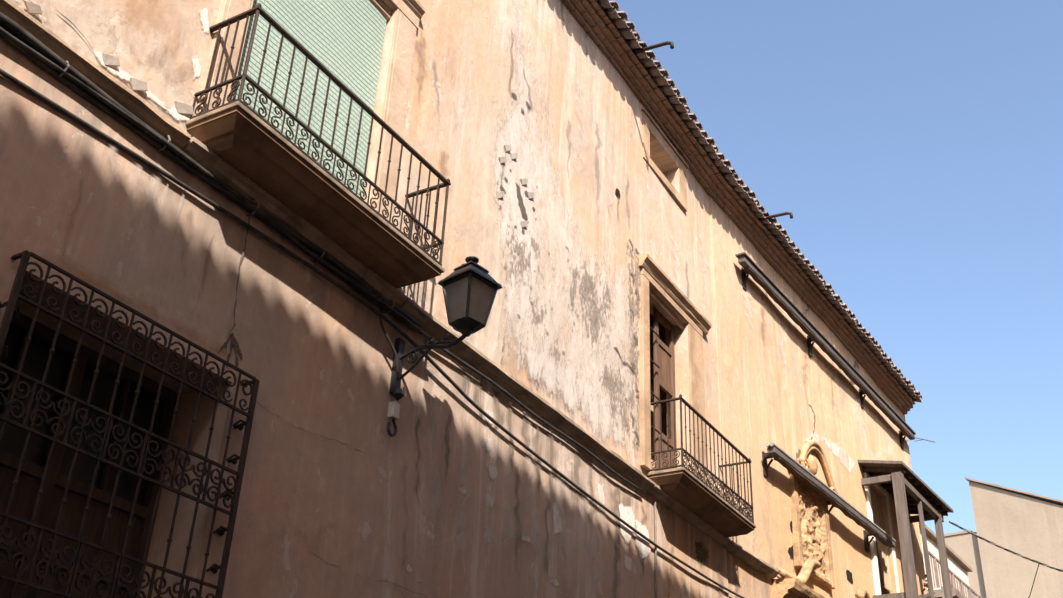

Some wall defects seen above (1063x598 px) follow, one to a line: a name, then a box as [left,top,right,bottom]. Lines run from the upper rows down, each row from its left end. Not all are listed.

flaking render [24,0,193,120]
crack [218,212,250,368]
flaking render [491,34,641,460]
water stain [494,392,557,480]
flaking render [597,483,605,504]
water stain [611,486,631,598]
flaking render [619,504,651,572]